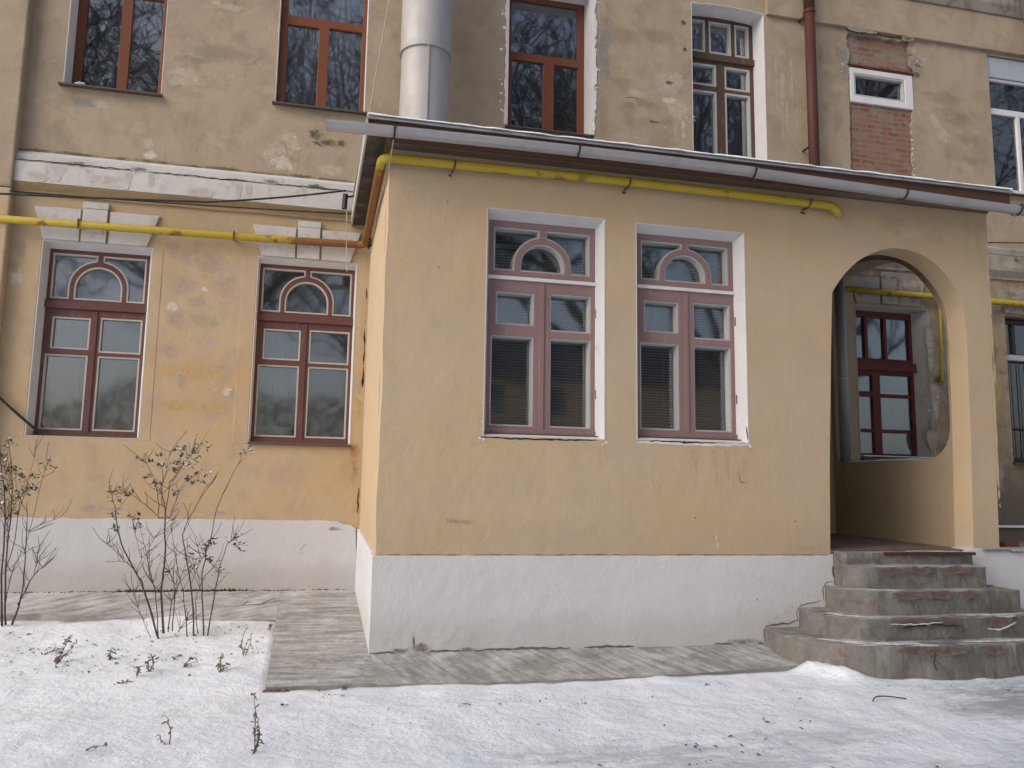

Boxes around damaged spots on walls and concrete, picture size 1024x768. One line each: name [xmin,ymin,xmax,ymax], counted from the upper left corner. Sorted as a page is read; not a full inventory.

flaking render [835,26,925,81]
flaking render [262,129,301,174]
damp [306,129,347,165]
flaking render [849,102,913,176]
crack [360,289,368,387]
flaking render [924,326,947,452]